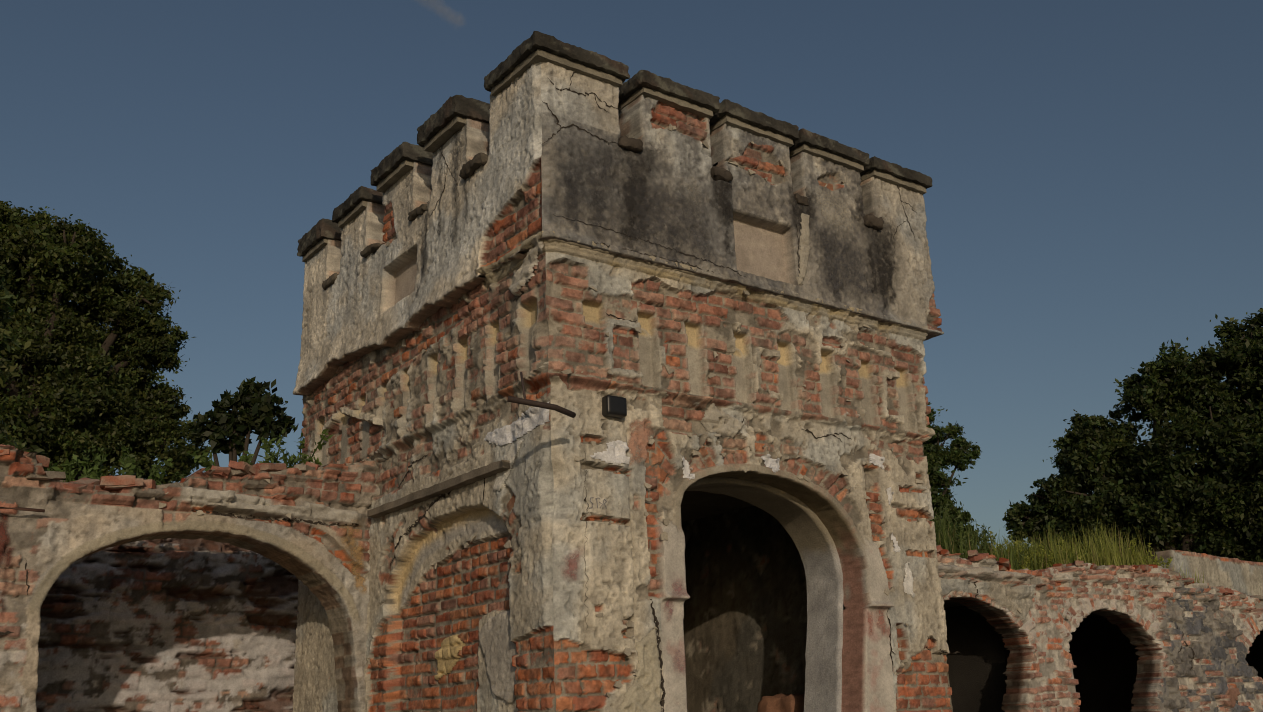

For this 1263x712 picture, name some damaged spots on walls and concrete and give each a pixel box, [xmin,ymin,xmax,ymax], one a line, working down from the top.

crack [542,72,618,144]
water stain [622,149,710,257]
water stain [713,180,733,253]
water stain [789,187,898,308]
crack [893,185,917,240]
spalling [474,155,642,491]
spalling [206,298,475,484]
spalling [574,324,936,599]
spalling [158,485,370,579]
spalling [365,531,636,712]
crack [633,599,666,712]
spalling [1002,584,1081,712]